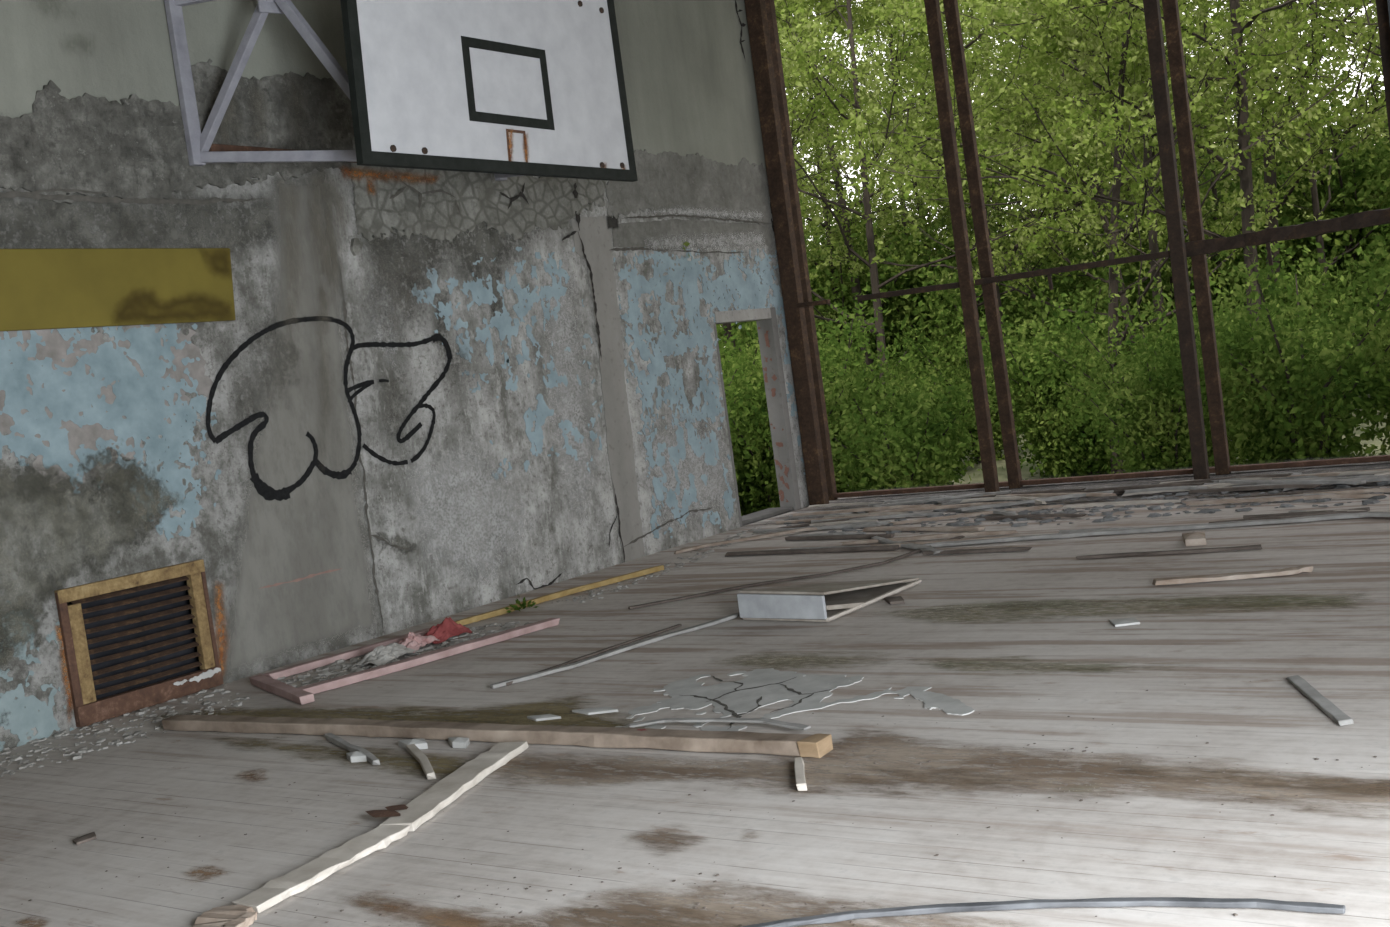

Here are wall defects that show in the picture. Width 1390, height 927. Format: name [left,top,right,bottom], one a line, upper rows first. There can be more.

spalling [0,59,354,204]
spalling [605,149,773,229]
peeling [0,323,222,541]
peeling [411,247,603,480]
peeling [613,247,806,539]
damp [0,448,177,667]
peeling [0,600,74,752]
crack [681,676,834,729]
damp [1204,771,1390,796]